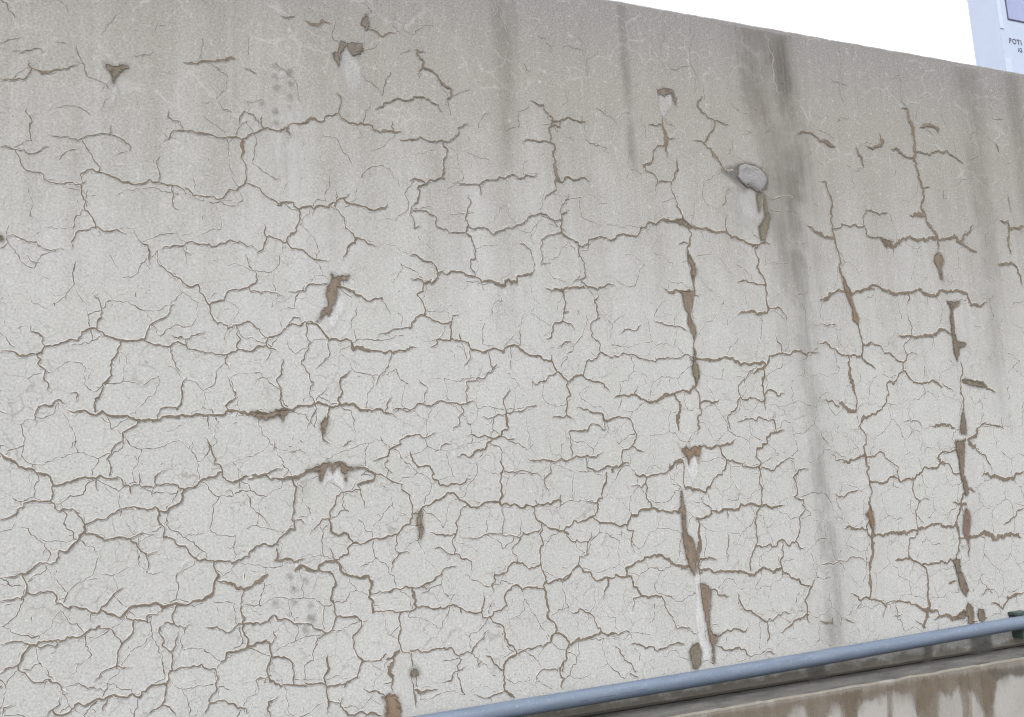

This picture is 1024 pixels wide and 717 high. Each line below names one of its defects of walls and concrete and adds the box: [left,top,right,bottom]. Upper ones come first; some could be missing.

crack [0,37,114,120]
crack [183,38,236,119]
crack [375,95,443,112]
crack [400,48,470,115]
crack [982,181,1024,287]
spalling [316,272,351,322]
crack [337,279,391,313]
spalling [680,252,697,337]
spalling [947,300,966,360]
spalling [955,408,969,496]
spalling [677,491,718,669]
spalling [953,558,985,623]